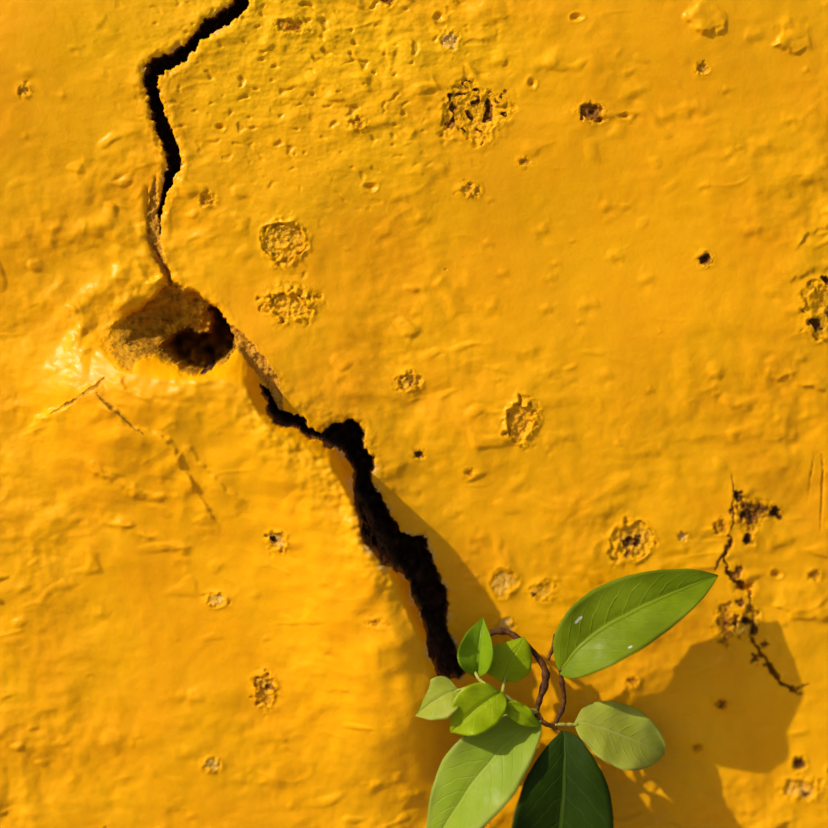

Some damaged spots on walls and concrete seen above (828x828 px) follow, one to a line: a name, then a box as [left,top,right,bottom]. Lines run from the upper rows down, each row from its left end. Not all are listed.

spalling [438,77,519,149]
crack [98,0,466,681]
spalling [797,275,828,344]
spalling [607,515,659,566]
crack [715,473,753,608]
crack [750,636,809,695]